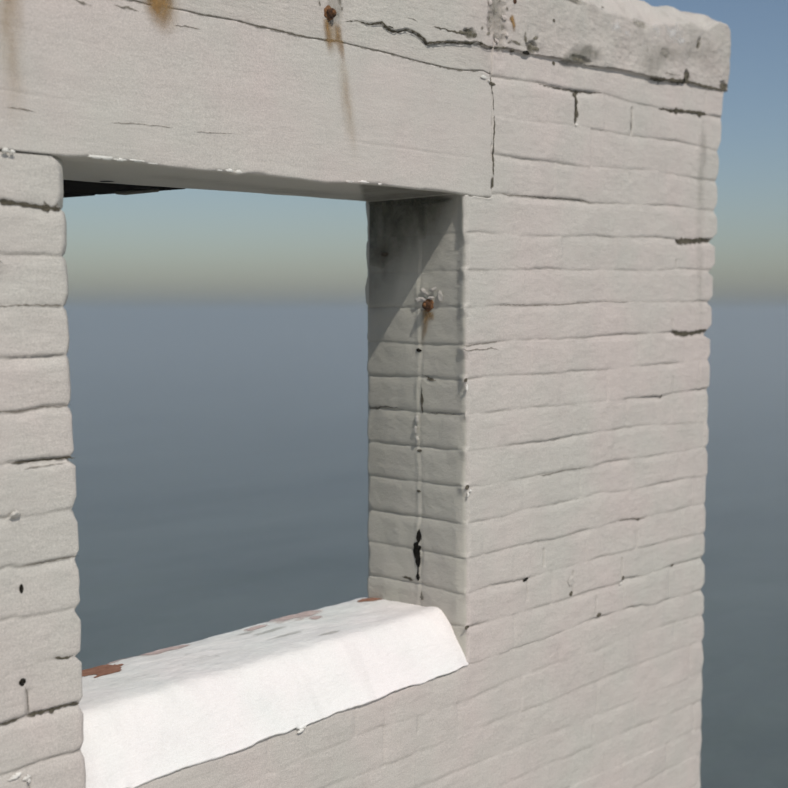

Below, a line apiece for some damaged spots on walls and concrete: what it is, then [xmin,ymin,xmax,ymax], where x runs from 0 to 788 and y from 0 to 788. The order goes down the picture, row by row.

rust [150,0,170,18]
rust [326,20,343,47]
spalling [459,0,539,52]
crack [650,73,728,92]
crack [176,11,590,203]
crack [659,108,707,117]
damp [368,188,447,260]
crack [676,237,710,245]
crack [672,329,706,337]
crack [401,529,423,600]
peeling [246,610,321,631]
flaking render [82,645,188,678]